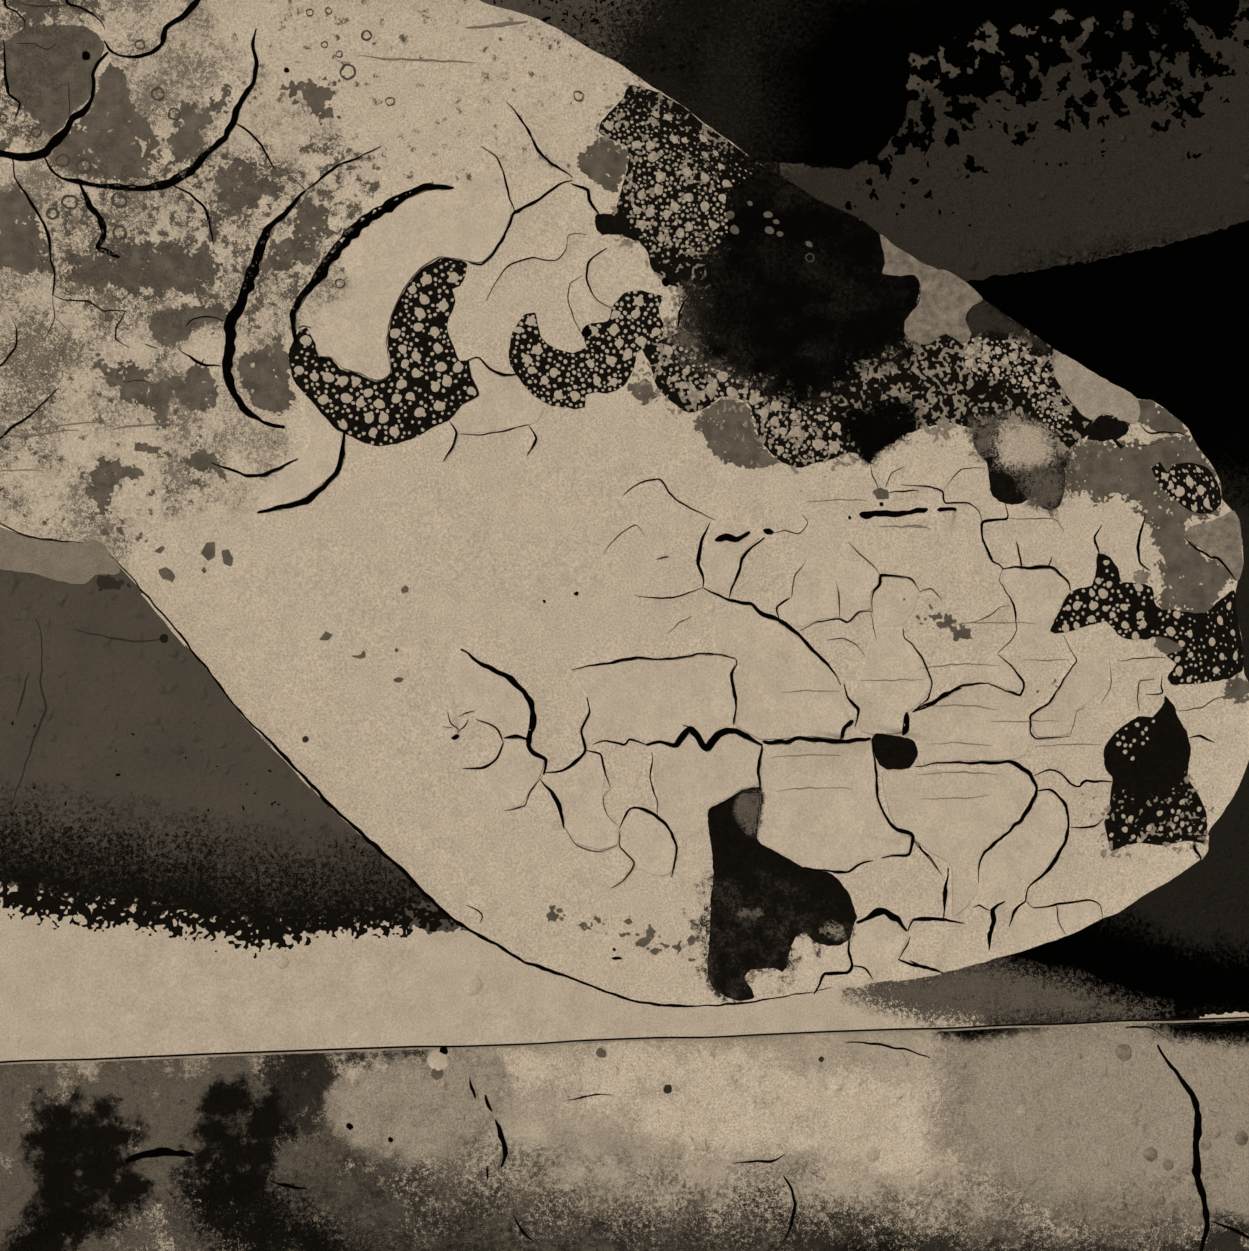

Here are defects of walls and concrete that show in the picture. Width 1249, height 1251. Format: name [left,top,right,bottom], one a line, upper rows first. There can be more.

peeling [0,528,120,584]
crack [0,0,381,429]
crack [257,431,345,513]
crack [289,183,454,344]
crack [469,102,611,340]
peeling [254,77,1140,516]
peeling [447,522,1109,1004]
crack [441,464,1236,994]
leakage [609,0,1249,682]
peeling [1002,462,1244,859]
leakage [0,762,1249,1251]
crack [1125,1026,1249,1251]